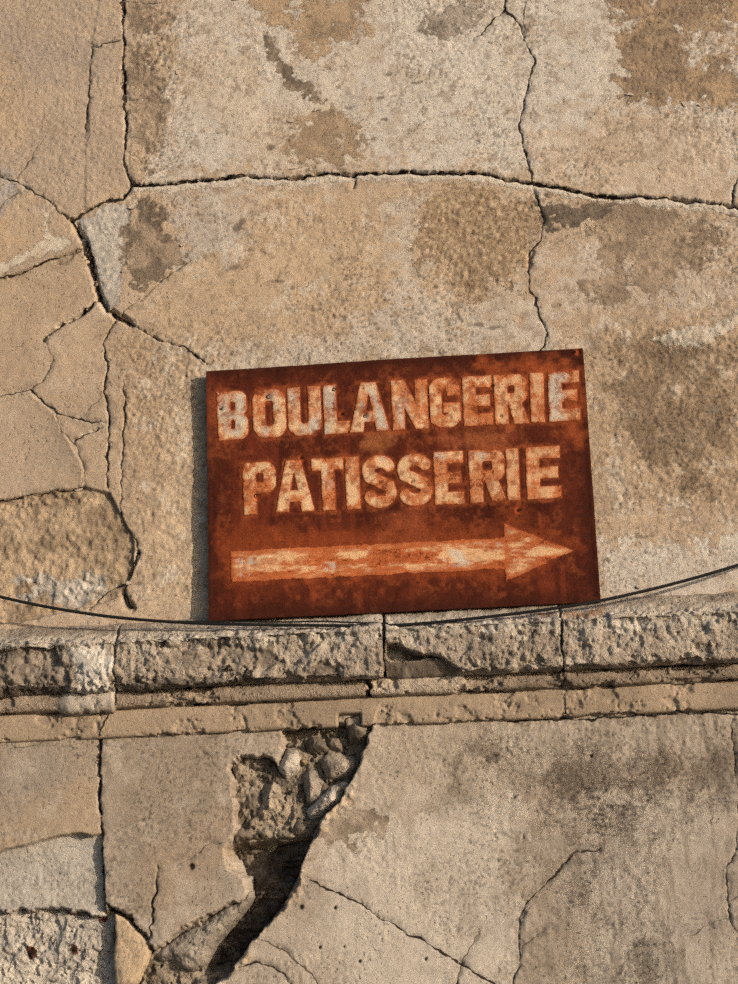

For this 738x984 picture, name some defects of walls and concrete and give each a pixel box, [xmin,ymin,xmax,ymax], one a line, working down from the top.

crack [0,0,738,610]
crack [344,627,386,728]
crack [508,622,738,784]
spalling [0,722,390,984]
crack [238,940,318,984]
crack [309,849,599,984]
crack [690,831,738,936]